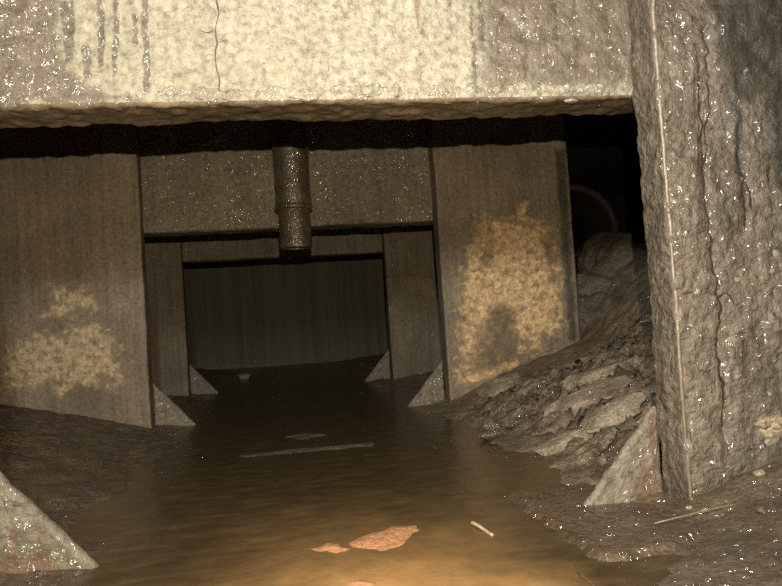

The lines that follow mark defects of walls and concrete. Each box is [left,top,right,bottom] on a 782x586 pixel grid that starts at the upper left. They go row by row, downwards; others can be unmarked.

damp [0,0,119,108]
damp [132,0,150,91]
damp [557,152,575,339]
crack [695,35,734,453]
damp [480,308,517,362]